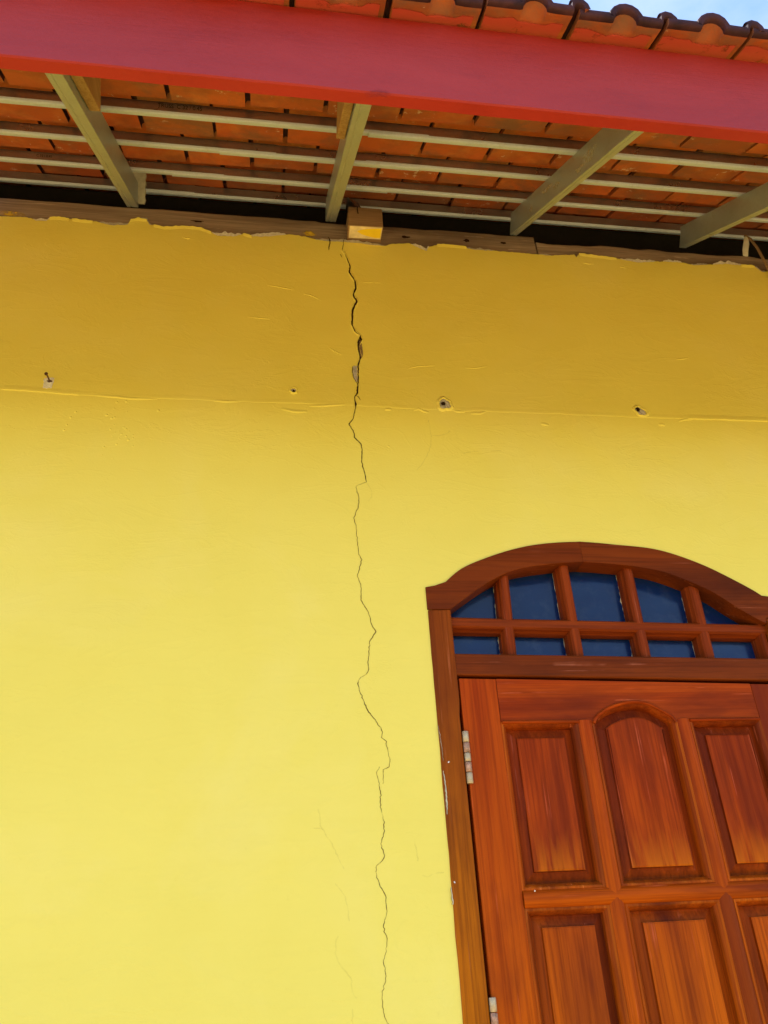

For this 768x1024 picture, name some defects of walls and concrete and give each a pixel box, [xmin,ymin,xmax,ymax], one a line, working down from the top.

spalling [34,216,286,238]
peeling [579,253,765,272]
crack [328,237,390,1021]